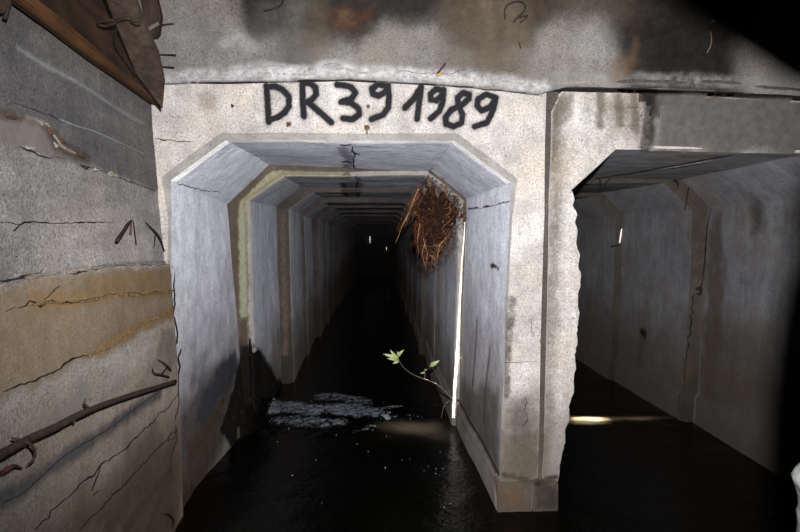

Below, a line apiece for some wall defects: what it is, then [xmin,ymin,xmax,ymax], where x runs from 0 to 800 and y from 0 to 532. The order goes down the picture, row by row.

spalling [0,111,121,178]
crack [13,102,193,155]
crack [340,144,361,198]
crack [0,221,114,231]
crack [678,208,711,413]
crack [0,261,182,530]